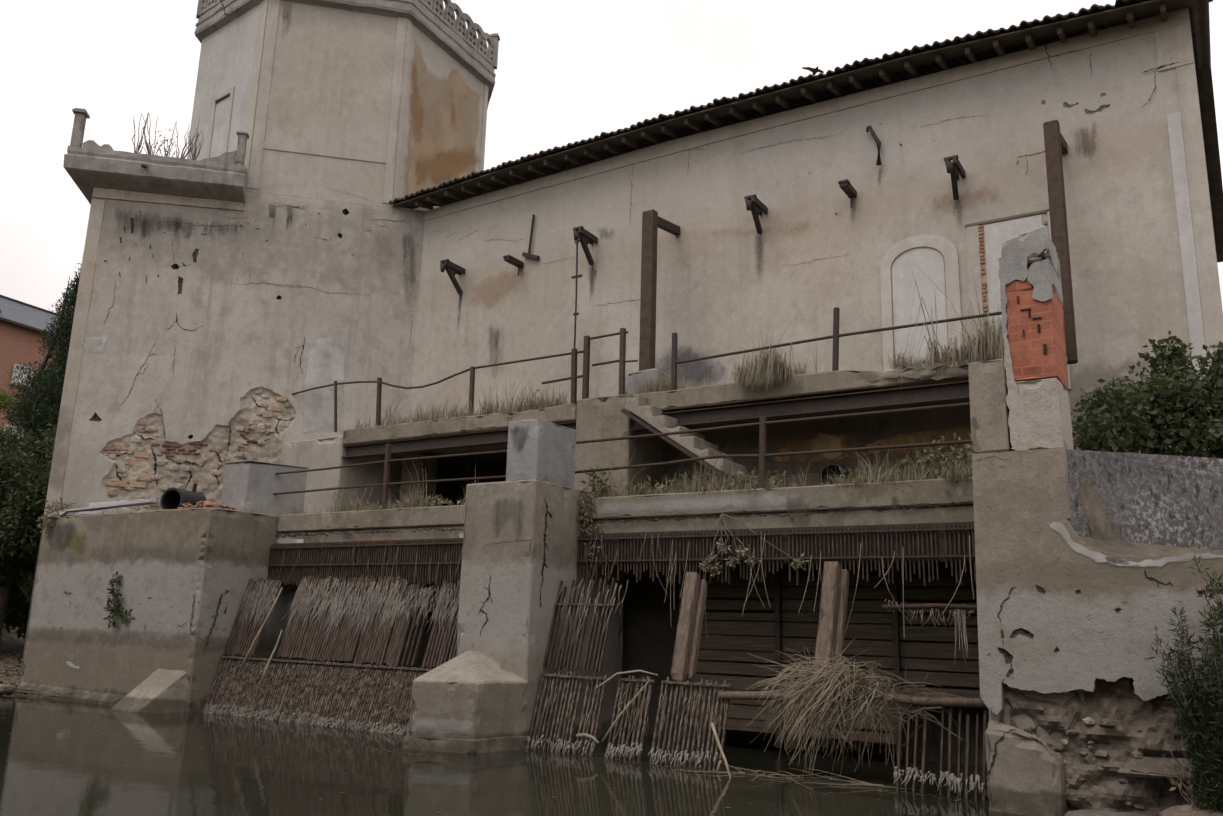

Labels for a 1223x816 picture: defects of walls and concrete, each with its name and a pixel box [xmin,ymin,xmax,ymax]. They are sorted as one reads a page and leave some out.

spalling [1063,93,1110,115]
crack [1143,62,1179,106]
leakage [135,215,189,234]
crack [103,314,293,487]
spalling [99,386,297,512]
crack [581,501,998,524]
crack [275,498,552,607]
crack [47,590,230,650]
crack [477,576,492,635]
spalling [997,628,1217,816]